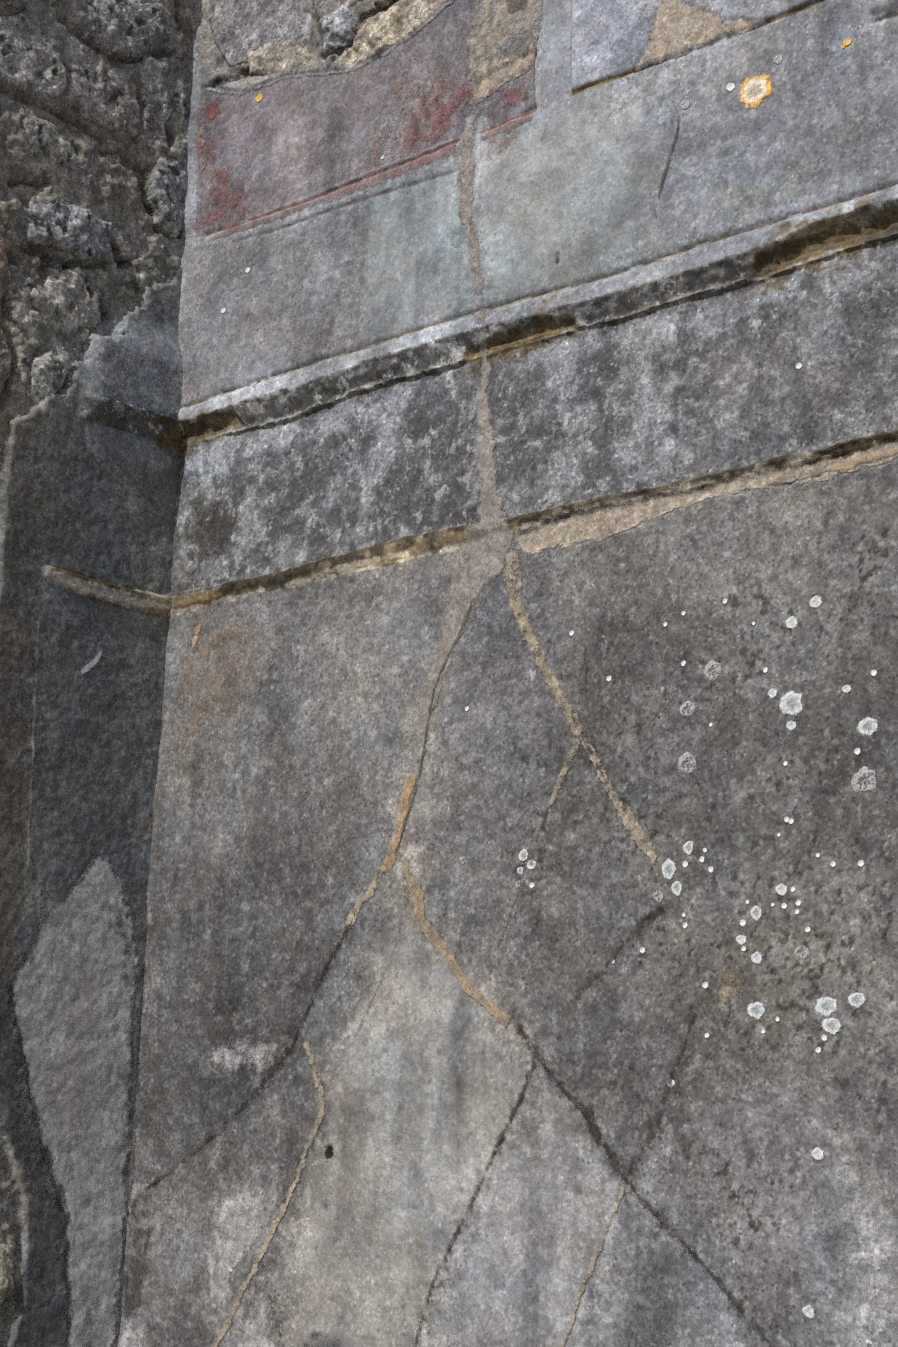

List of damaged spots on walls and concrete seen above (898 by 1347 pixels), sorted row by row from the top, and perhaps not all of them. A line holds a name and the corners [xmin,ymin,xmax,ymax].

spalling [191,0,542,240]
crack [127,115,769,1347]